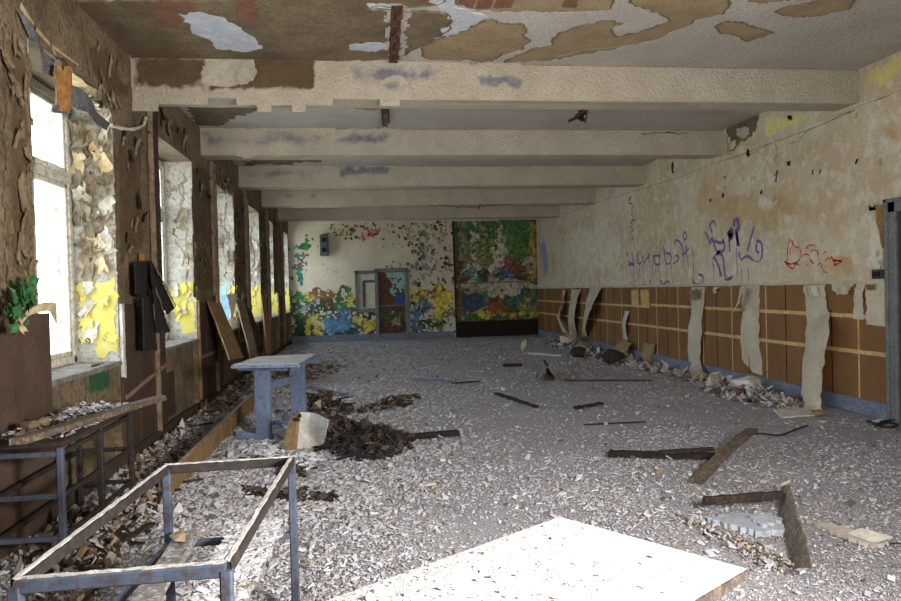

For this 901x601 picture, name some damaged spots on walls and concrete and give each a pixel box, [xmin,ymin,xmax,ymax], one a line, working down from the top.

flaking render [74,0,247,29]
corrosion [384,3,412,63]
spalling [400,0,775,63]
peeling [201,59,257,87]
corrosion [381,108,390,128]
peeling [1,24,39,284]
peeling [66,22,149,345]
peeling [709,114,778,212]
peeling [328,220,455,289]